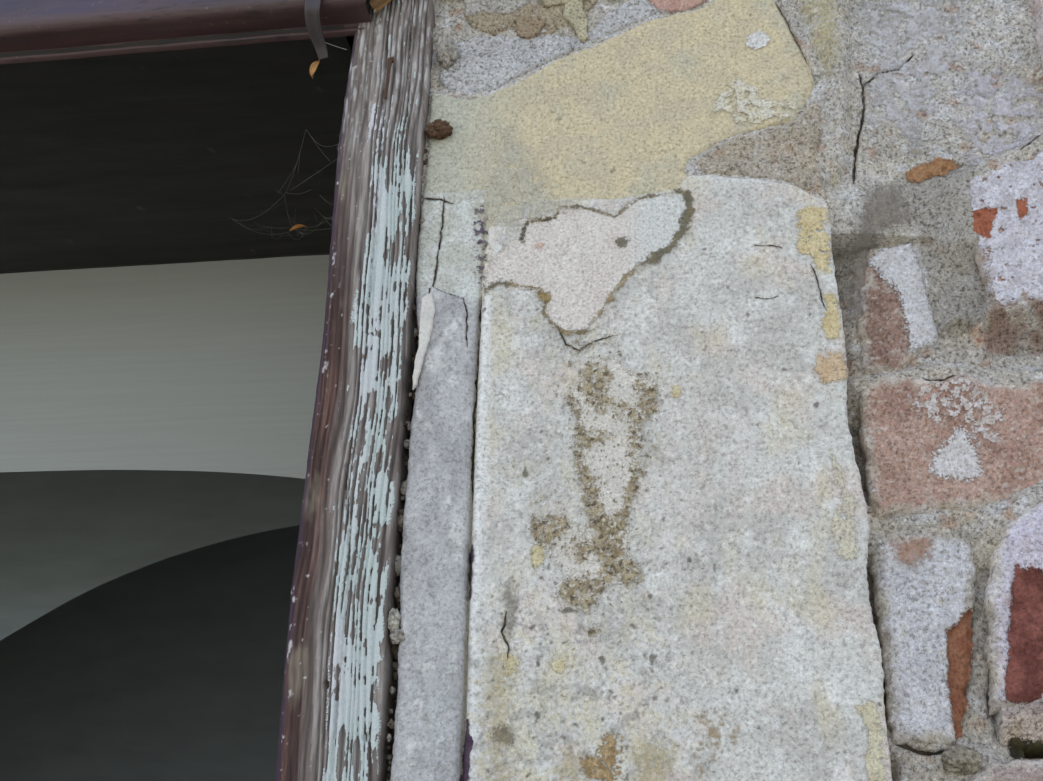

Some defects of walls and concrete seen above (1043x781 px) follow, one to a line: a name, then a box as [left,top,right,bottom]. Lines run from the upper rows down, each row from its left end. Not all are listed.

crack [853,55,913,184]
peeling [472,191,687,332]
spalling [971,205,998,240]
spalling [1016,197,1028,218]
peeling [319,18,435,781]
crack [424,198,482,500]
spalling [1002,563,1043,705]